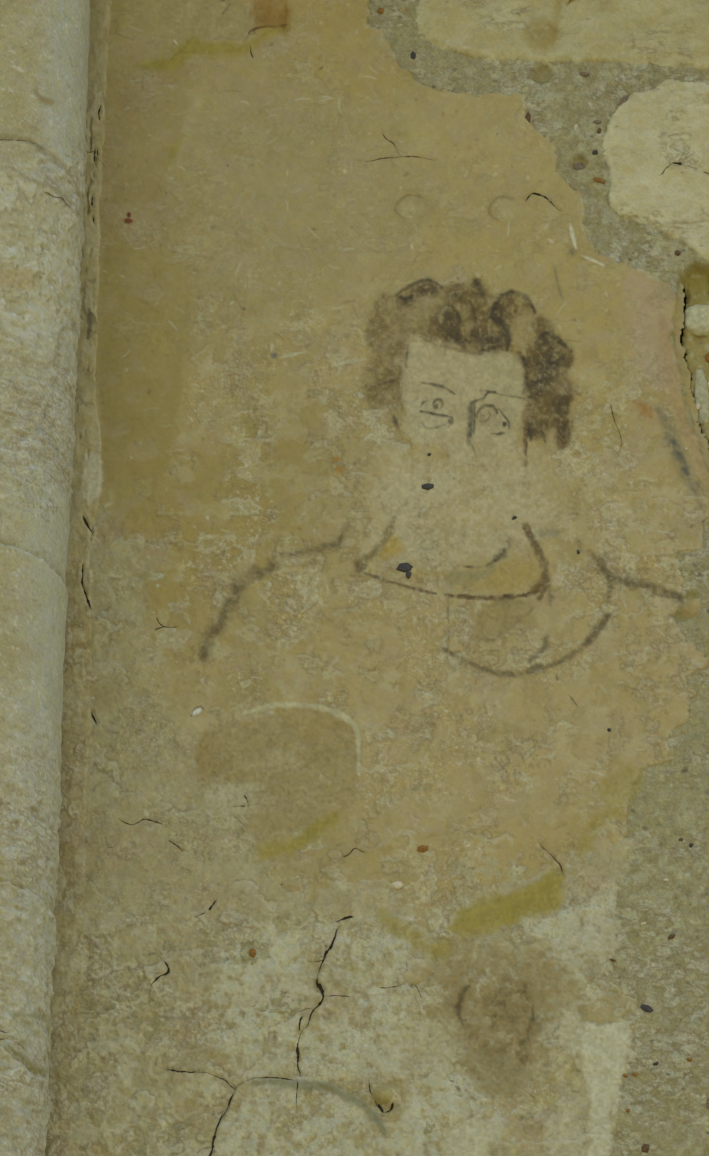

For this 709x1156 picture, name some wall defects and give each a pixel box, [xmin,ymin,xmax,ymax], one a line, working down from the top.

peeling [566,222,607,267]
peeling [396,563,413,579]
crack [160,916,353,1156]
spalling [423,905,636,1156]
crack [369,1083,394,1113]